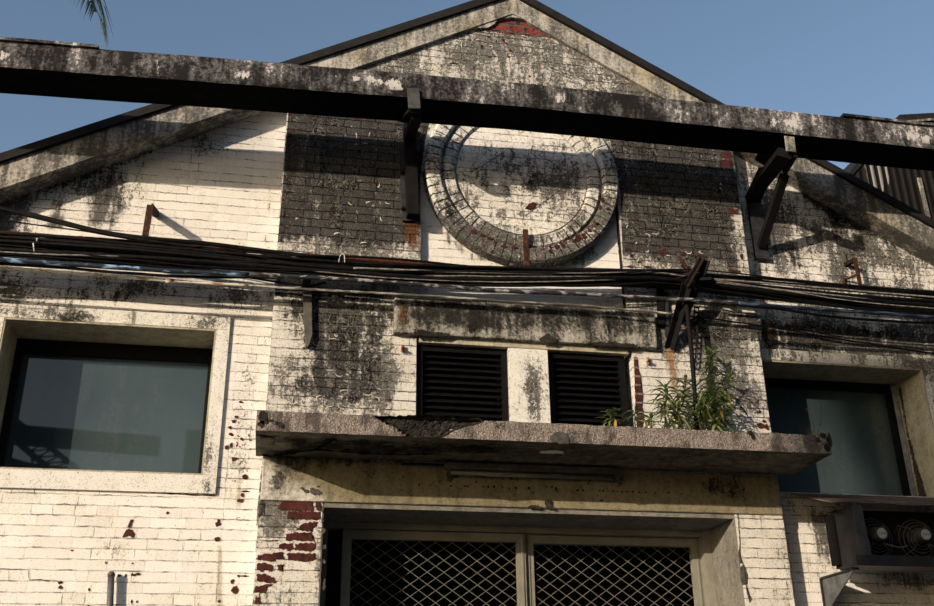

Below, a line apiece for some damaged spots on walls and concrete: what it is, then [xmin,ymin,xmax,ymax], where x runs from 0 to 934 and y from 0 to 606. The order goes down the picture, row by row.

spalling [473,14,551,81]
water stain [800,192,920,259]
water stain [788,241,803,269]
water stain [275,289,393,407]
water stain [409,287,648,338]
rust [666,349,677,393]
water stain [684,309,917,352]
spalling [354,389,484,438]
spalling [230,465,326,604]